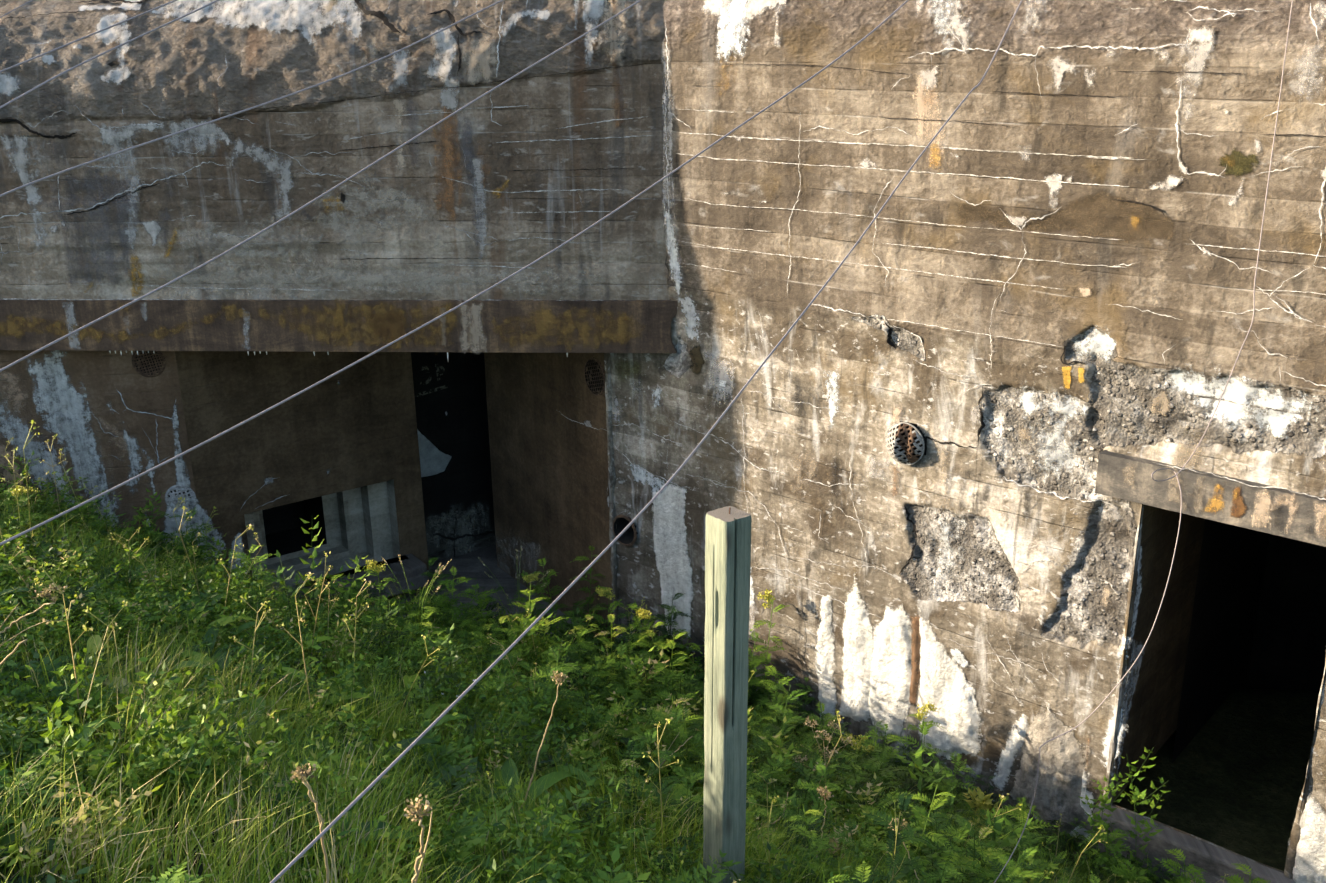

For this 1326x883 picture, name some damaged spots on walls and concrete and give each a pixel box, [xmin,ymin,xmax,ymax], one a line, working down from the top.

leakage [39,40,56,65]
leakage [73,0,363,70]
rust [433,106,509,254]
crack [0,0,1326,448]
rust [151,303,456,349]
rust [493,308,637,347]
leakage [0,304,119,530]
leakage [123,422,156,494]
leakage [145,406,248,583]
leakage [815,581,981,760]